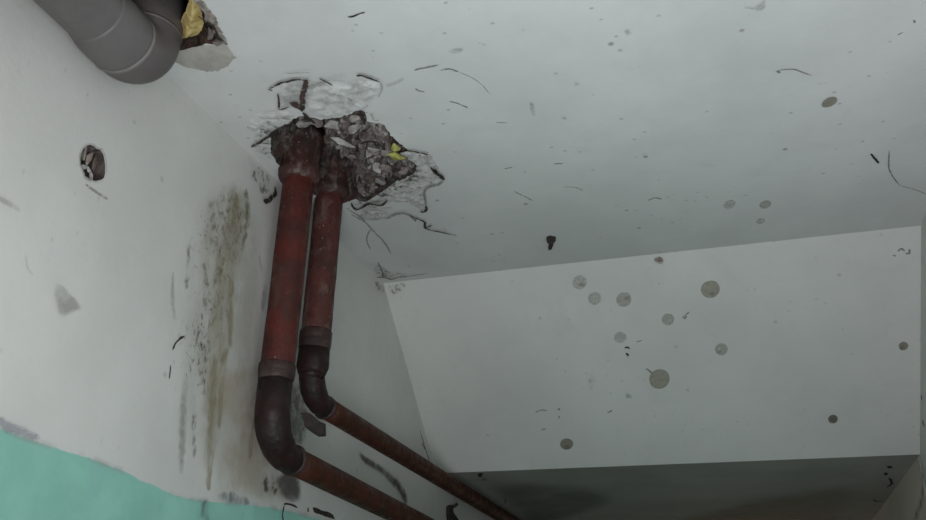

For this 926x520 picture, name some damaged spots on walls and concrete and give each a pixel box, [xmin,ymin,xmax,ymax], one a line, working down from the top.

flaking render [175,0,237,72]
spalling [80,145,108,199]
flaking render [247,72,457,236]
damp [184,193,249,428]